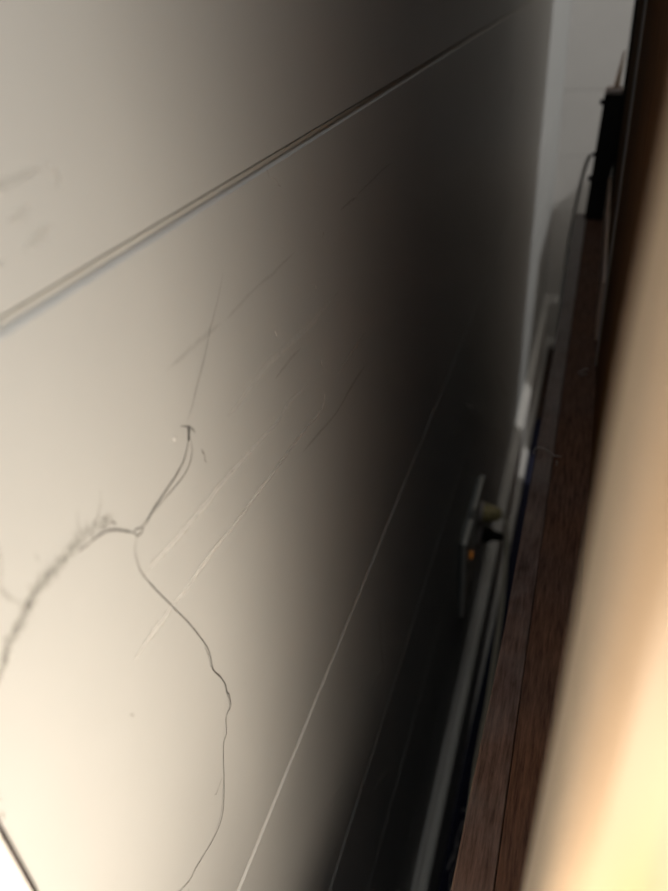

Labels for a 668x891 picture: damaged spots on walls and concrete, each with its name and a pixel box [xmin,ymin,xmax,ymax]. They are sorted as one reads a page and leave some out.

crack [81,426,204,550]
crack [137,562,231,891]